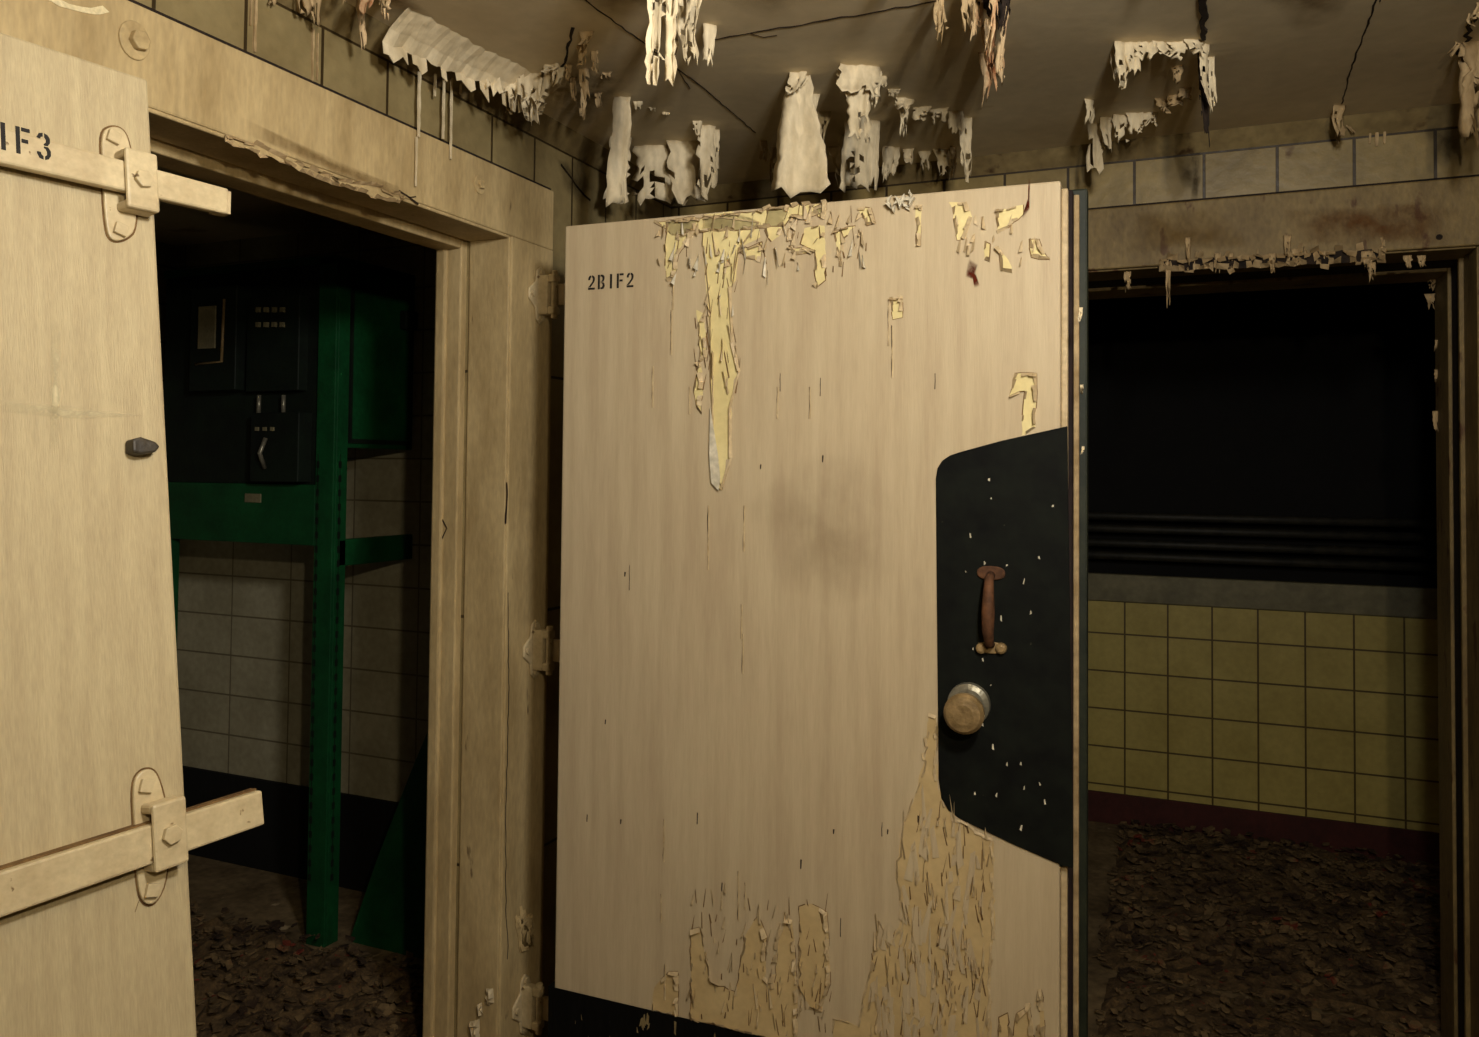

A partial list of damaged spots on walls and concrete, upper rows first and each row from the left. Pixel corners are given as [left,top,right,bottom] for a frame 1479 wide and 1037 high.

peeling [296,0,321,27]
peeling [1084,39,1217,174]
peeling [1447,2,1479,150]
peeling [342,0,1011,491]
peeling [949,202,1050,273]
peeling [1158,235,1436,310]
peeling [1009,372,1038,436]
peeling [637,713,1046,1037]